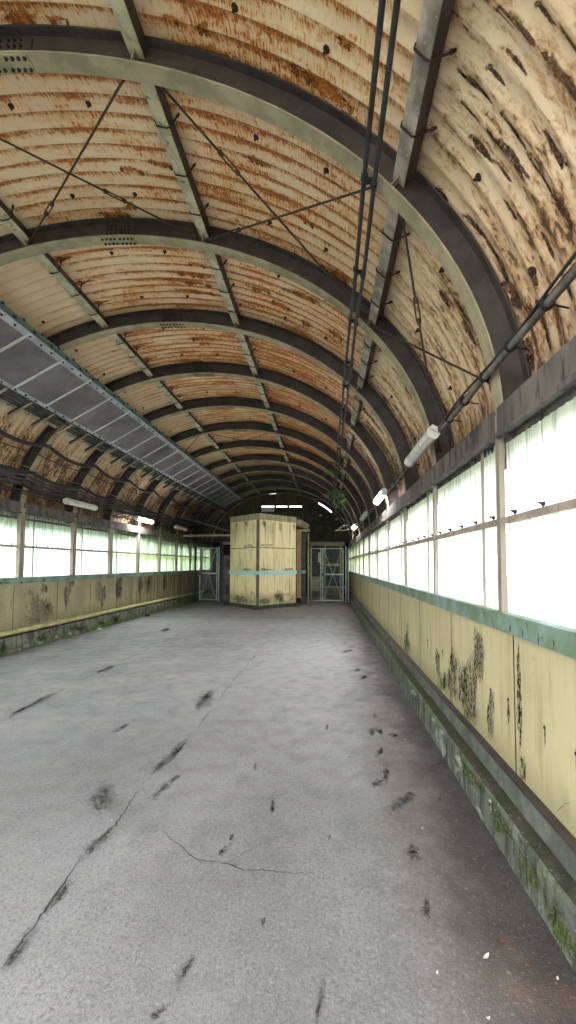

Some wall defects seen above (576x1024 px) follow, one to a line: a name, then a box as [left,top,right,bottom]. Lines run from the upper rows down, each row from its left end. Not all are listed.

corrosion [255,64,361,121]
corrosion [457,68,491,103]
corrosion [485,64,505,85]
corrosion [494,1,576,100]
corrosion [461,100,572,229]
corrosion [157,262,216,296]
corrosion [462,214,551,351]
damp [28,584,53,639]
damp [435,630,494,738]
mould [507,646,526,780]
crack [165,833,315,875]
crack [0,859,80,969]